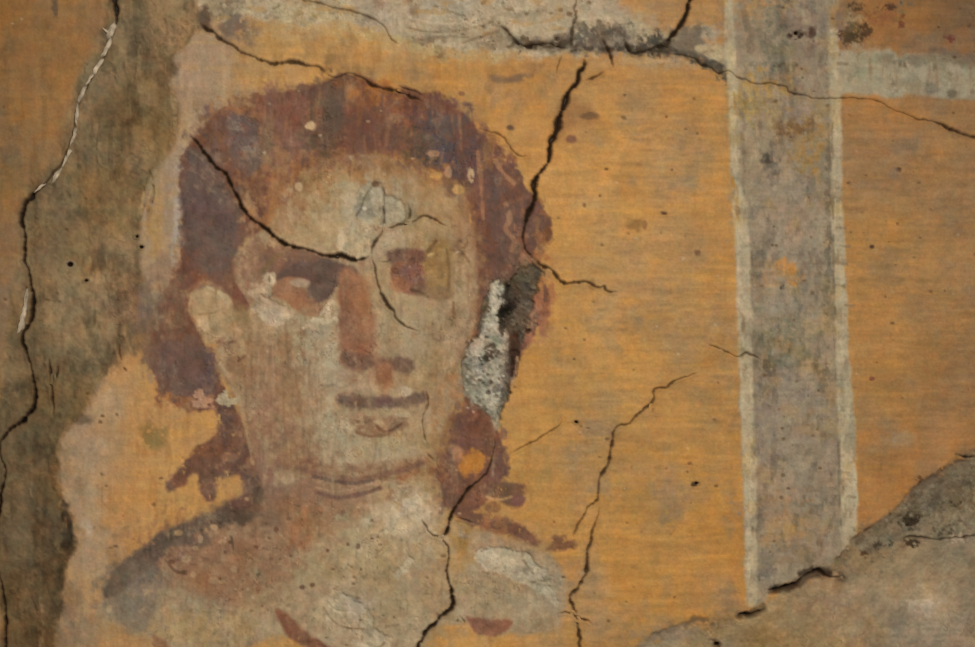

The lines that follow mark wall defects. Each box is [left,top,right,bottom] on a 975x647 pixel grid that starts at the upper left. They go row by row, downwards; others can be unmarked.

crack [0,0,122,647]
crack [197,20,426,104]
crack [187,132,449,335]
crack [287,0,401,48]
flaking render [461,265,546,427]
crack [479,0,975,296]
crack [706,341,764,364]
crack [413,418,566,647]
peeling [474,547,560,607]
crack [558,370,698,647]